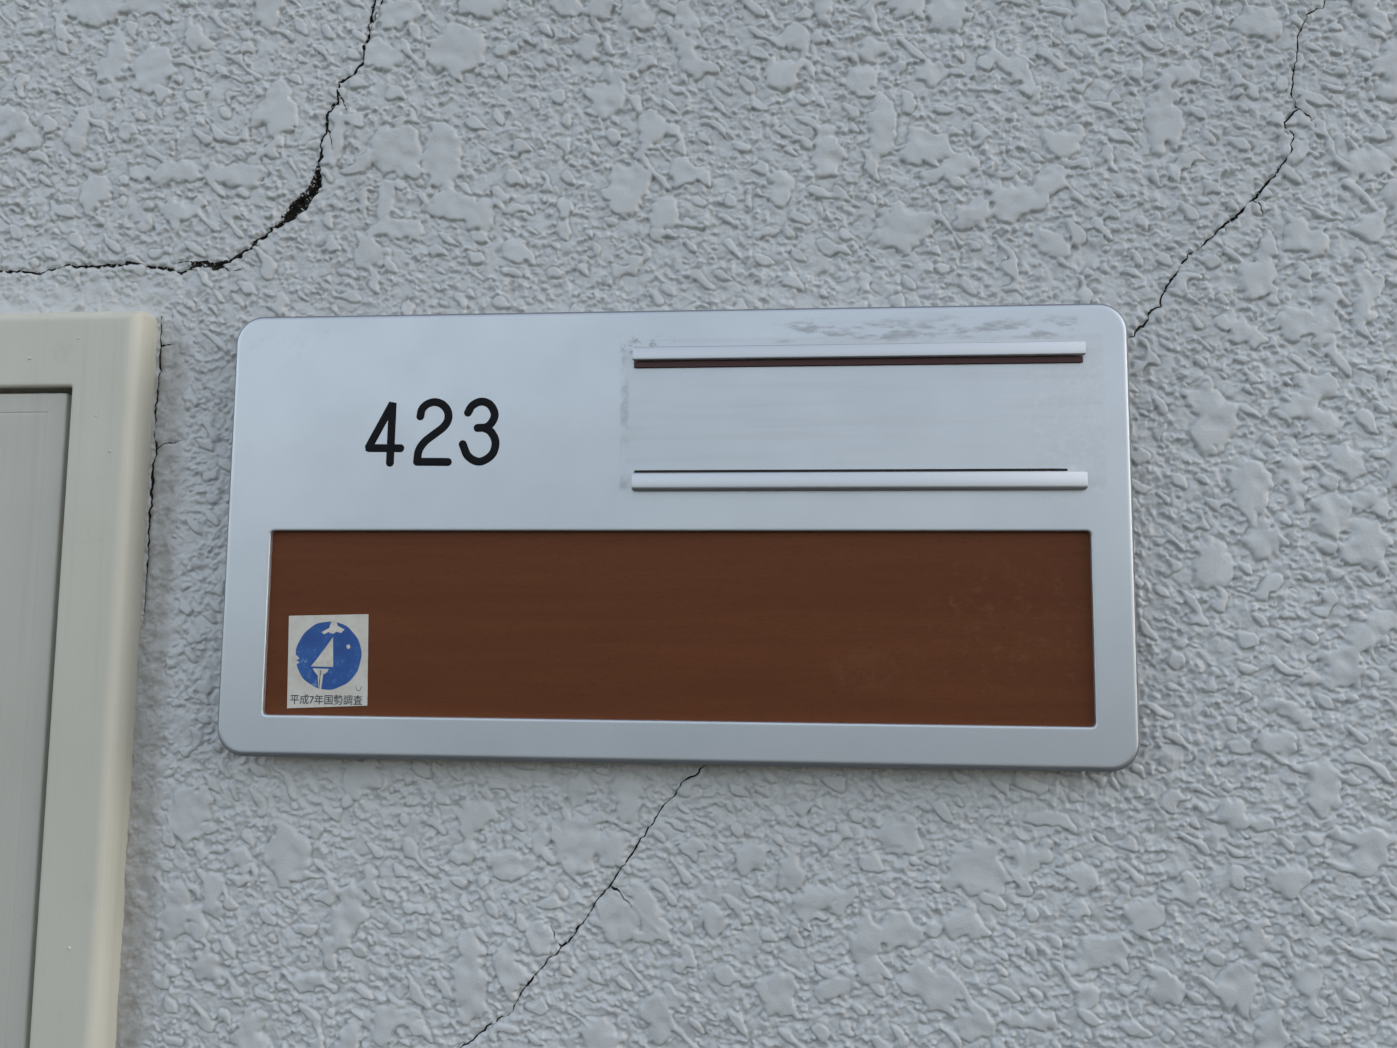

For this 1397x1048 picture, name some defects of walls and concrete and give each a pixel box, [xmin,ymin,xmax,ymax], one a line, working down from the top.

crack [0,0,383,275]